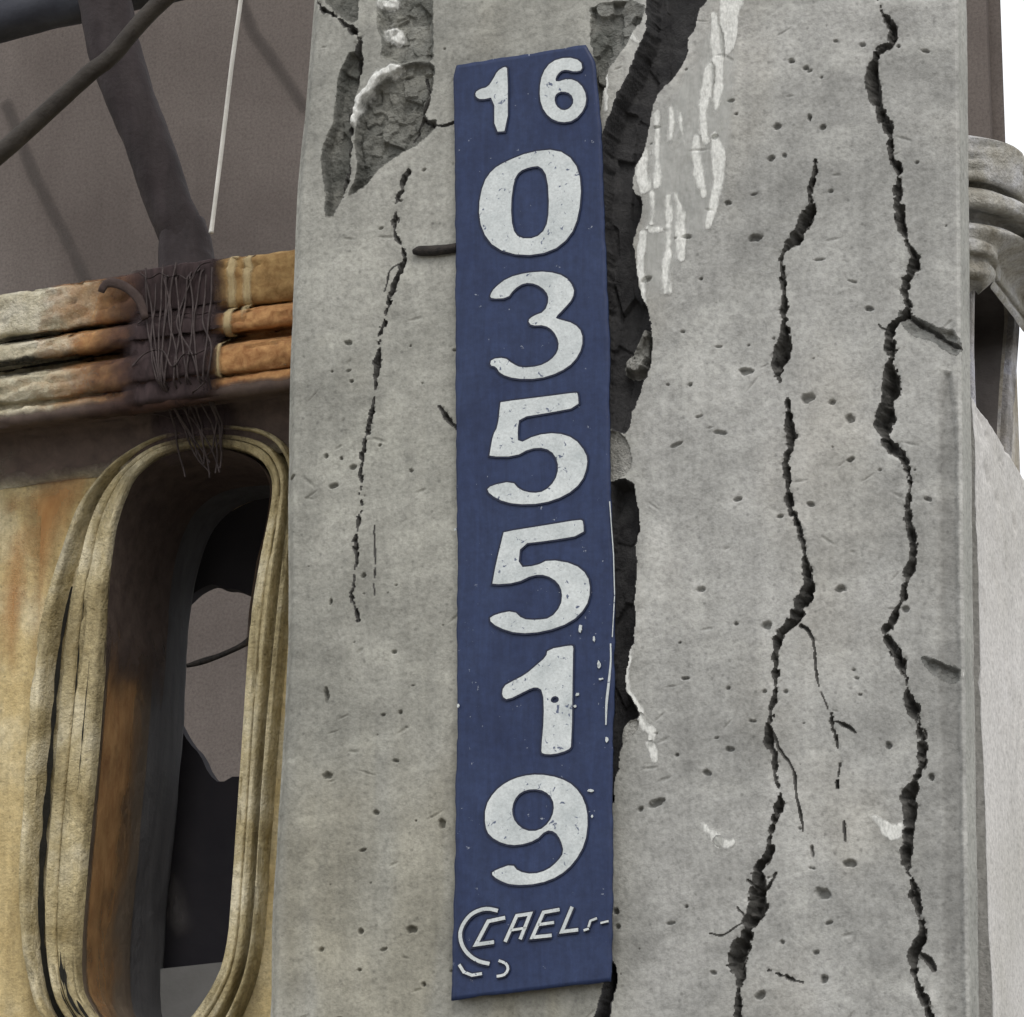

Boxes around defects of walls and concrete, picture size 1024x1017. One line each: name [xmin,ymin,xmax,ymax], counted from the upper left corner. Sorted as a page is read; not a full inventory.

crack [317,0,364,198]
spalling [320,0,437,217]
crack [349,78,457,623]
leakage [635,0,744,302]
crack [709,158,857,1017]
crack [864,0,963,1017]